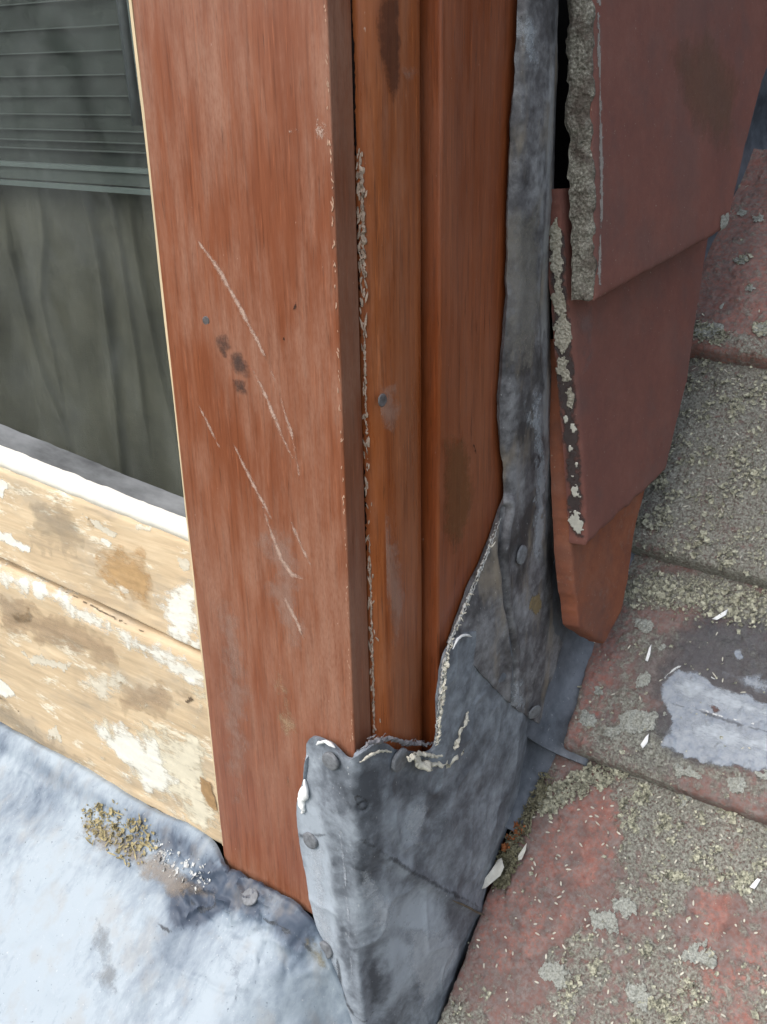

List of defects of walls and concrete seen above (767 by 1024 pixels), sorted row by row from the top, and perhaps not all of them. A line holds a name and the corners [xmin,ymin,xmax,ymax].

leakage [381,0,400,90]
leakage [218,341,245,390]
peeling [0,531,30,553]
peeling [0,565,206,706]
peeling [85,516,200,649]
peeling [93,719,217,831]